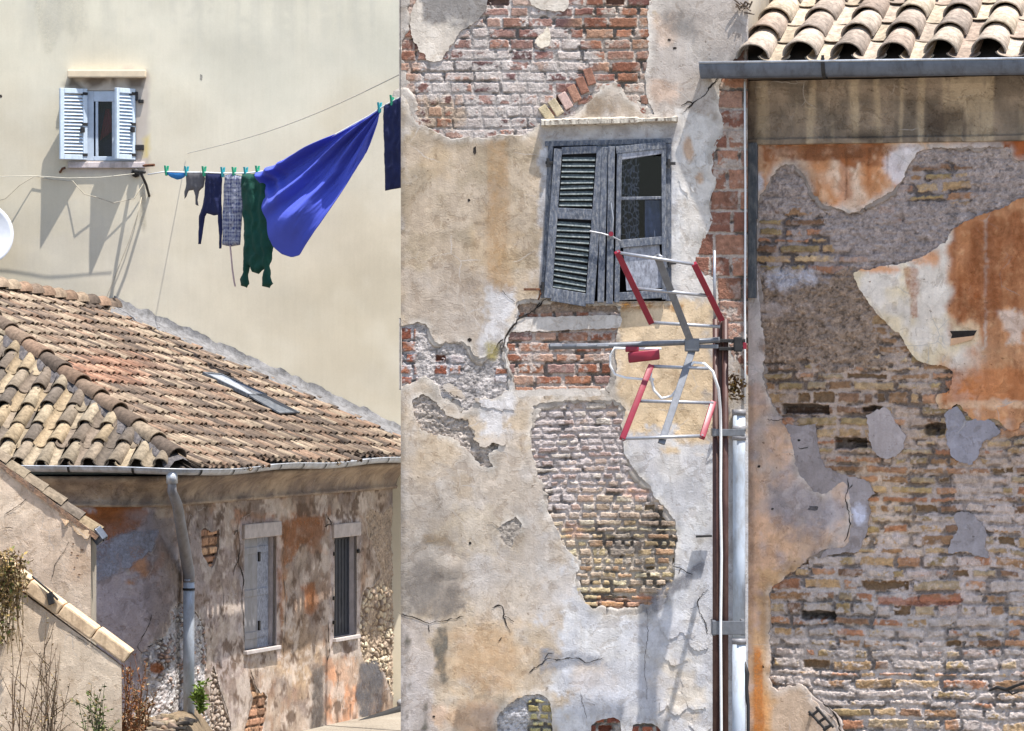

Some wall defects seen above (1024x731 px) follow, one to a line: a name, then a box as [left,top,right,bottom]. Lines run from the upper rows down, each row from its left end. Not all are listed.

spalling [392,0,654,154]
crack [681,79,717,112]
crack [495,291,547,350]
spalling [678,78,1024,731]
spalling [399,298,678,617]
spalling [201,529,217,567]
spalling [359,505,394,696]
crack [398,612,463,632]
crack [492,604,514,641]
spalling [140,601,232,731]
crack [529,653,602,673]
spalling [497,694,553,731]